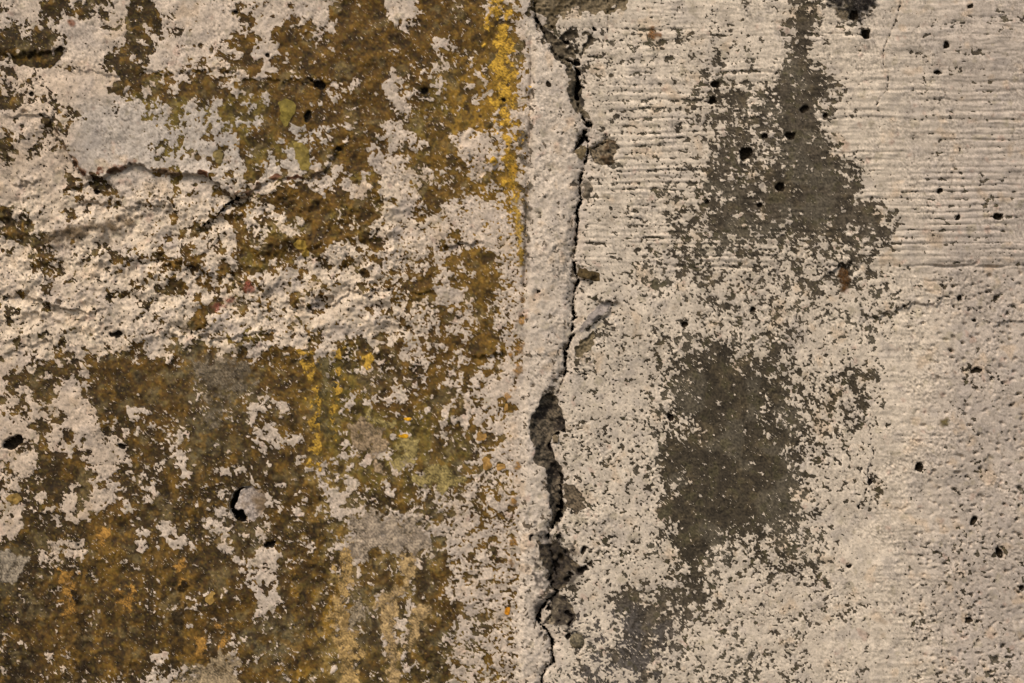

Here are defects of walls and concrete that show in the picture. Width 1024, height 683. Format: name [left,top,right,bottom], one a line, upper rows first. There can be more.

damp [482,0,530,277]
crack [203,194,247,226]
crack [563,55,606,376]
damp [296,347,467,495]
damp [0,548,30,585]
damp [57,568,89,683]
damp [95,527,111,547]
damp [114,584,137,611]
damp [170,557,242,683]
damp [324,505,437,683]
crack [535,573,559,683]
crack [547,504,564,539]